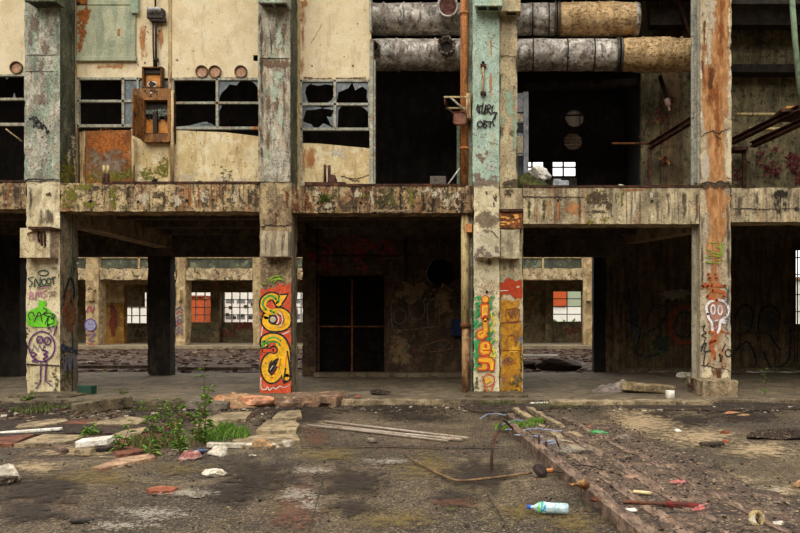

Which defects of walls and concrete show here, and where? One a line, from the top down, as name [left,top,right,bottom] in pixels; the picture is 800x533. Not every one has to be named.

peeling [28,14,53,74]
rust [76,0,91,52]
peeling [274,24,286,49]
peeling [259,57,289,150]
rust [86,129,131,156]
rust [697,0,731,307]
damp [527,199,554,220]
damp [682,193,704,230]